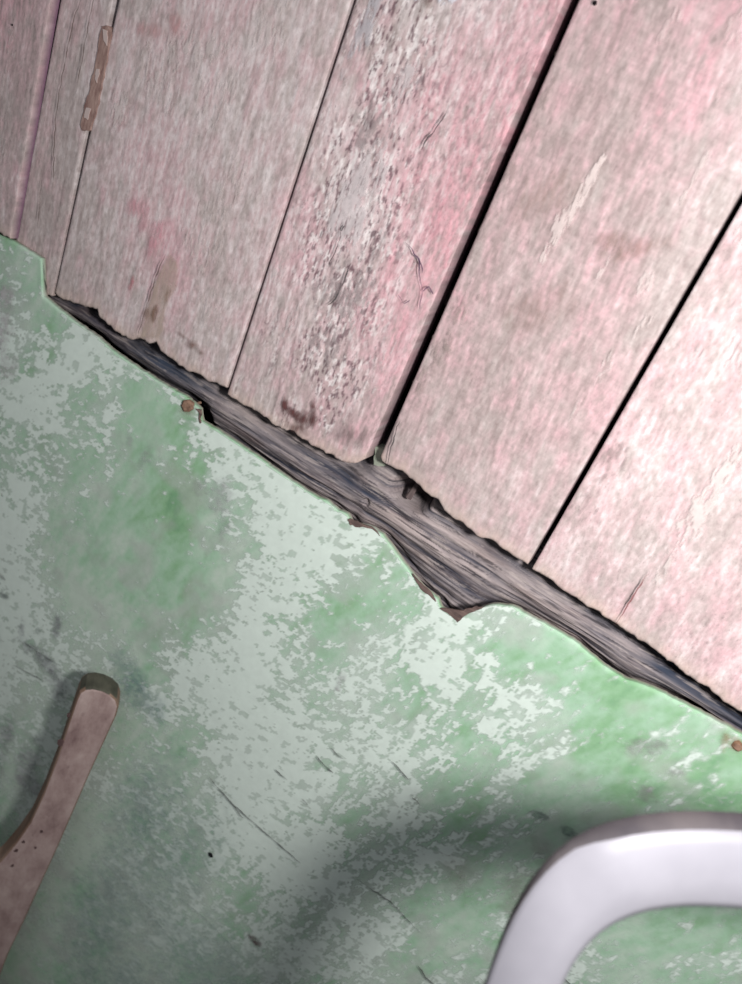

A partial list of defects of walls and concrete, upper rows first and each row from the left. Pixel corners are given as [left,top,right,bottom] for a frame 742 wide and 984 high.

peeling [540,154,607,263]
peeling [655,443,742,584]
peeling [0,239,586,984]
peeling [639,705,738,780]
crack [210,778,299,862]
peeling [564,939,618,984]
peeling [665,935,742,983]